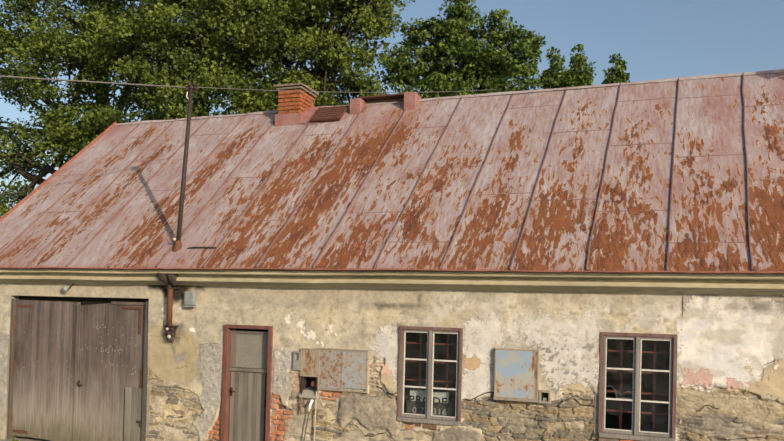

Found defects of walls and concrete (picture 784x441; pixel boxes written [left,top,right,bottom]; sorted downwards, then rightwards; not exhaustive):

rust [0,145,166,267]
rust [108,129,262,268]
rust [198,122,658,271]
rust [662,144,744,271]
rust [746,180,784,271]
rust [758,121,784,161]
flaking render [146,372,222,441]
flaking render [270,320,437,441]
flaking render [457,306,635,441]
peeling [675,294,784,441]